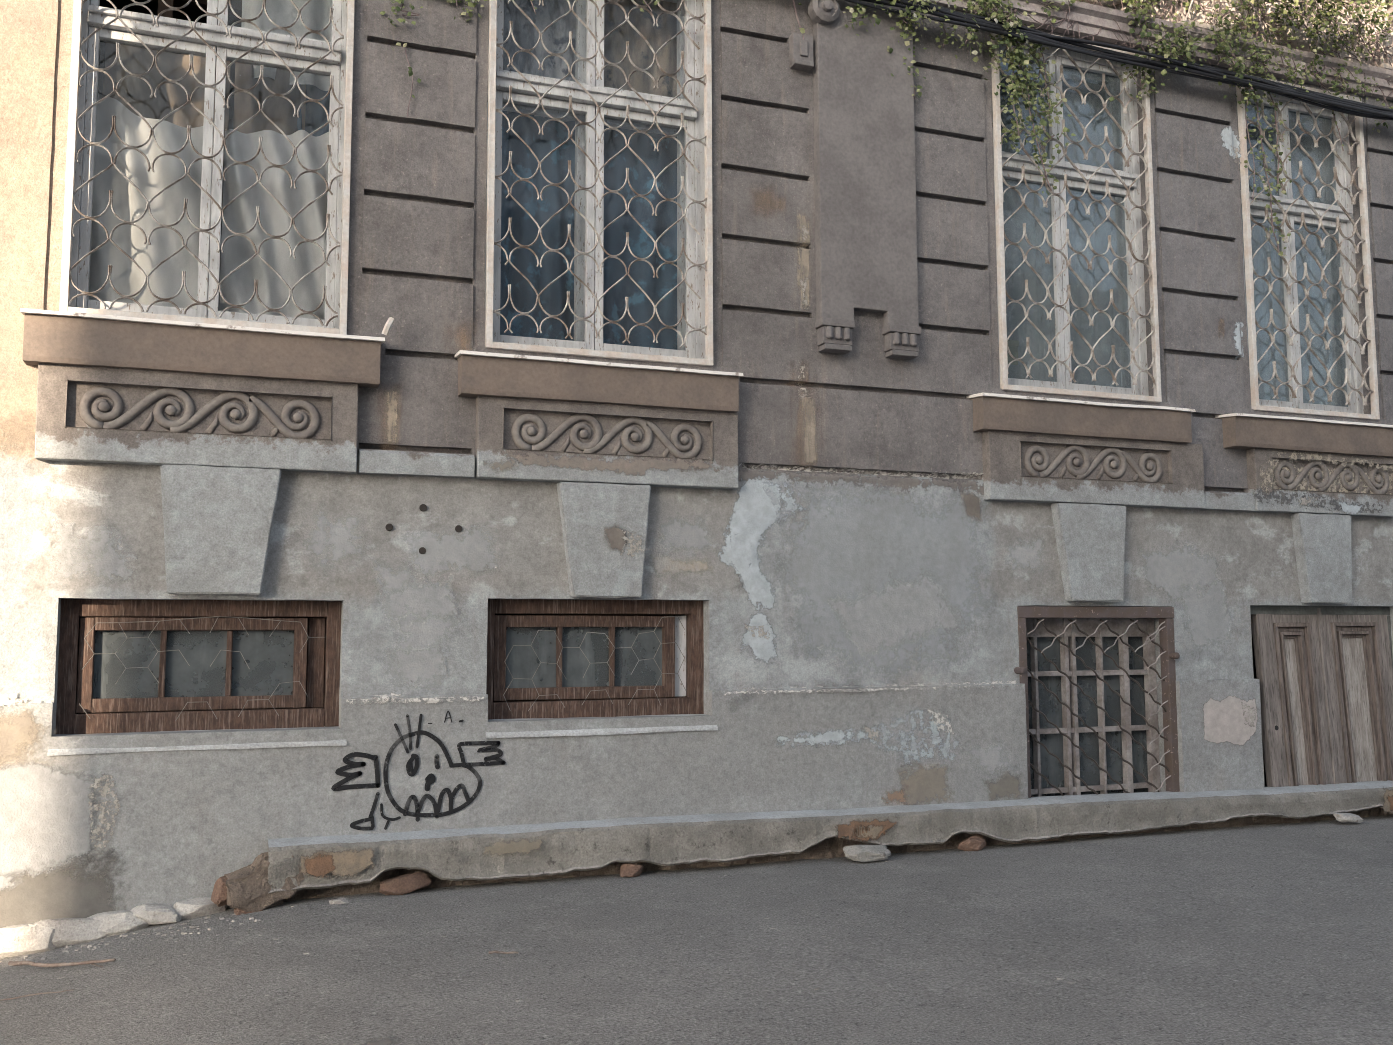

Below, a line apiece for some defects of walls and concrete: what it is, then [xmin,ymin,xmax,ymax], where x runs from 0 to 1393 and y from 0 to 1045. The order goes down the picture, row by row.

peeling [484,451,720,476]
peeling [1253,450,1393,515]
spalling [604,525,648,557]
peeling [718,463,984,664]